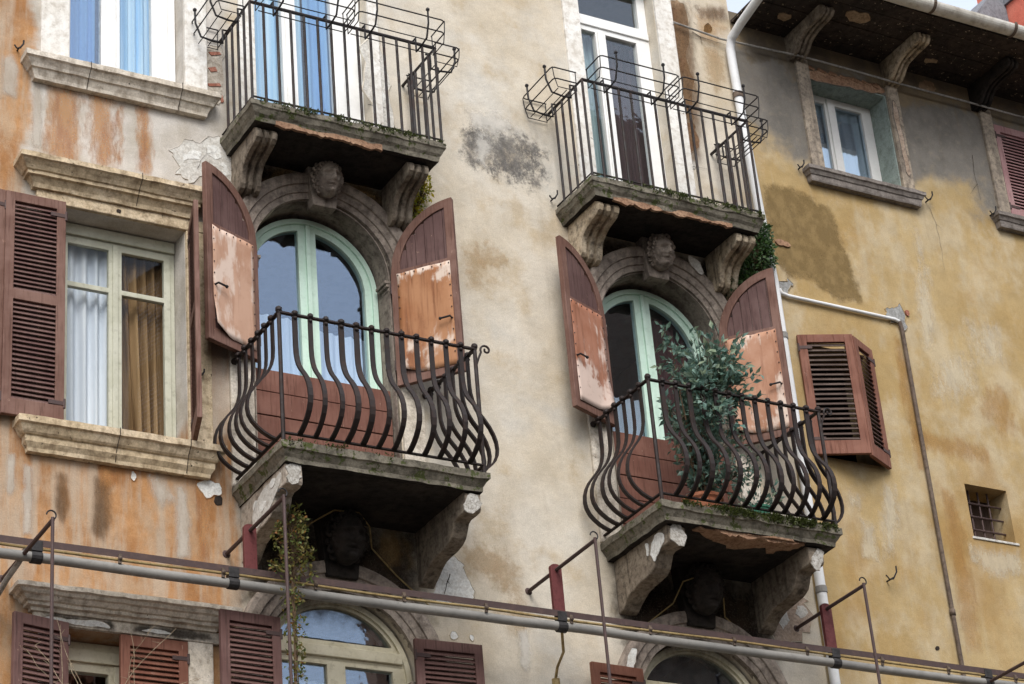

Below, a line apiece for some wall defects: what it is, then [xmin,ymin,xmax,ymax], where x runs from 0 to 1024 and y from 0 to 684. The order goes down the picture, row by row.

flaking render [845,10,870,24]
leakage [671,4,699,159]
rust [47,89,78,159]
rust [94,95,112,165]
rust [139,107,151,172]
flaking render [169,136,232,184]
leakage [765,186,862,301]
leakage [57,475,67,518]
leakage [94,480,108,534]
peeling [196,479,222,499]
spalling [645,524,824,571]
flaking render [432,555,476,603]